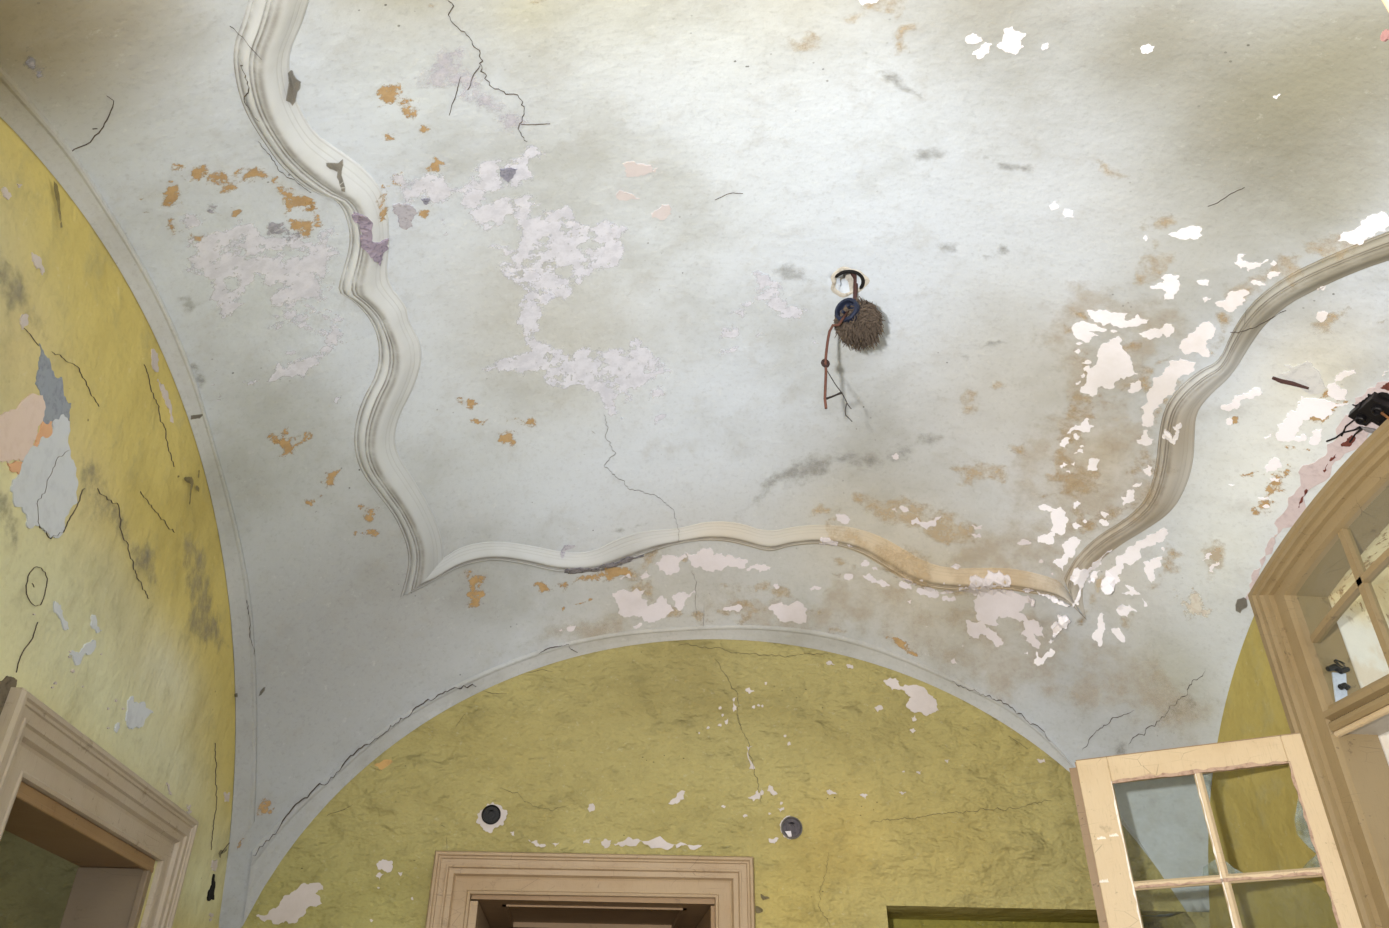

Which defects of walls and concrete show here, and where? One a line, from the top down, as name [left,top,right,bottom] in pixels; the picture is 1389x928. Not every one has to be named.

crack [448,1,550,142]
peeling [1338,211,1389,245]
peeling [0,343,78,538]
crack [24,328,99,407]
crack [144,364,174,467]
peeling [1071,310,1216,446]
flaking render [1245,361,1389,599]
crack [16,450,175,673]
peeling [560,544,821,629]
peeling [844,465,1168,666]
crack [211,644,578,856]
crack [1082,673,1204,750]